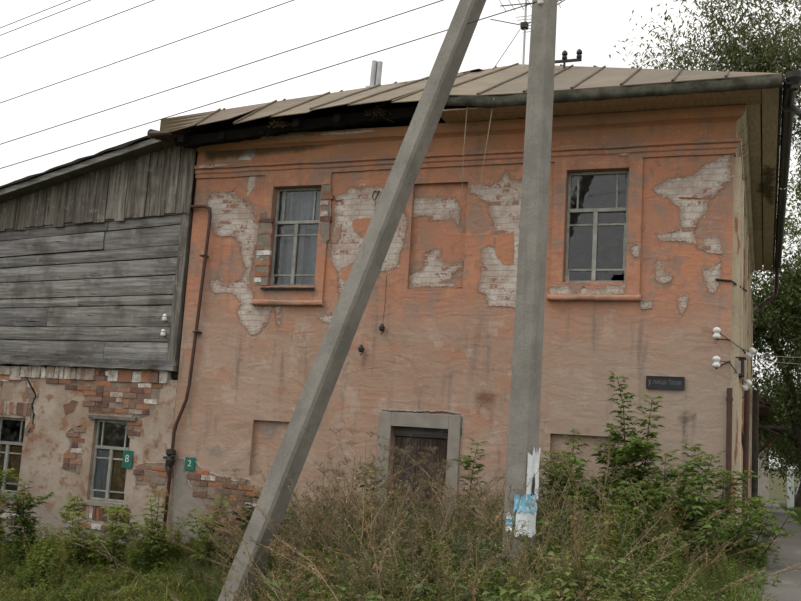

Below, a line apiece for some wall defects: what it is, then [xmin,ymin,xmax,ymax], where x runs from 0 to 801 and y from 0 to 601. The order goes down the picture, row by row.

peeling [207,176,282,339]
peeling [319,183,383,301]
peeling [377,195,461,279]
peeling [409,248,464,289]
peeling [470,171,522,310]
peeling [653,154,735,294]
spalling [0,374,38,436]
crack [27,377,39,435]
spalling [46,368,162,439]
spalling [62,426,86,474]